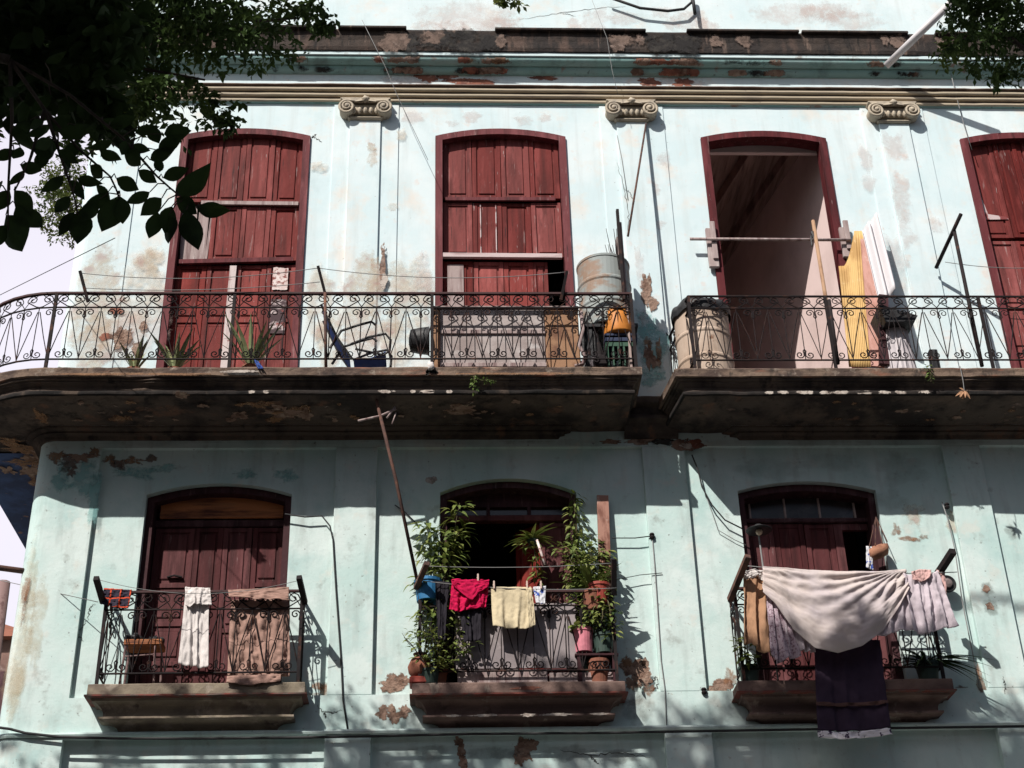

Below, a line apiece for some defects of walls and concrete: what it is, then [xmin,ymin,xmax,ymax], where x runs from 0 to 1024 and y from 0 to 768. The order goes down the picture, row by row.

spalling [372,30,510,84]
peeling [630,58,700,86]
spalling [709,34,753,48]
flaking render [640,273,659,312]
flaking render [643,336,662,370]
spalling [0,438,157,486]
flaking render [619,656,649,691]
flaking render [375,673,412,724]
flaking render [454,736,468,768]
flaking render [514,736,539,767]